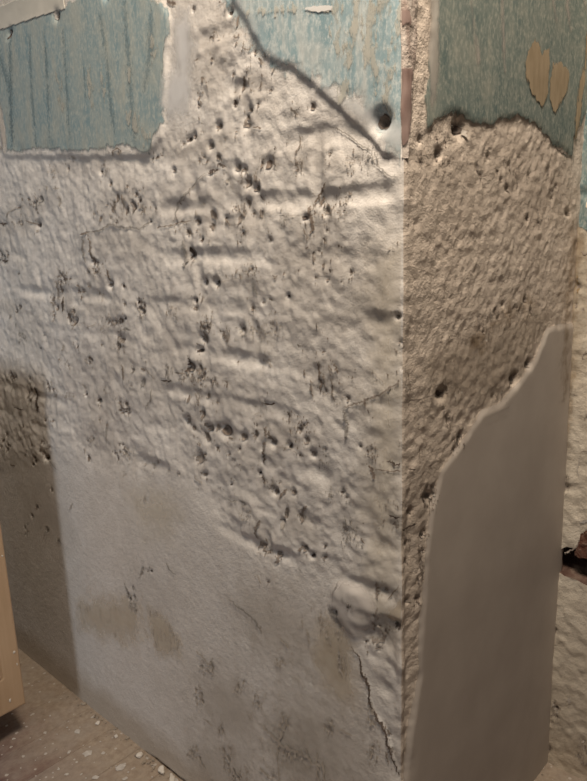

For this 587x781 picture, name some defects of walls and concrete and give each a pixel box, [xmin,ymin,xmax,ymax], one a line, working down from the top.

peeling [0,0,176,209]
peeling [207,0,587,230]
peeling [93,185,156,227]
flaking render [181,135,307,267]
flaking render [299,182,355,286]
flaking render [564,519,587,559]
crack [351,647,399,774]